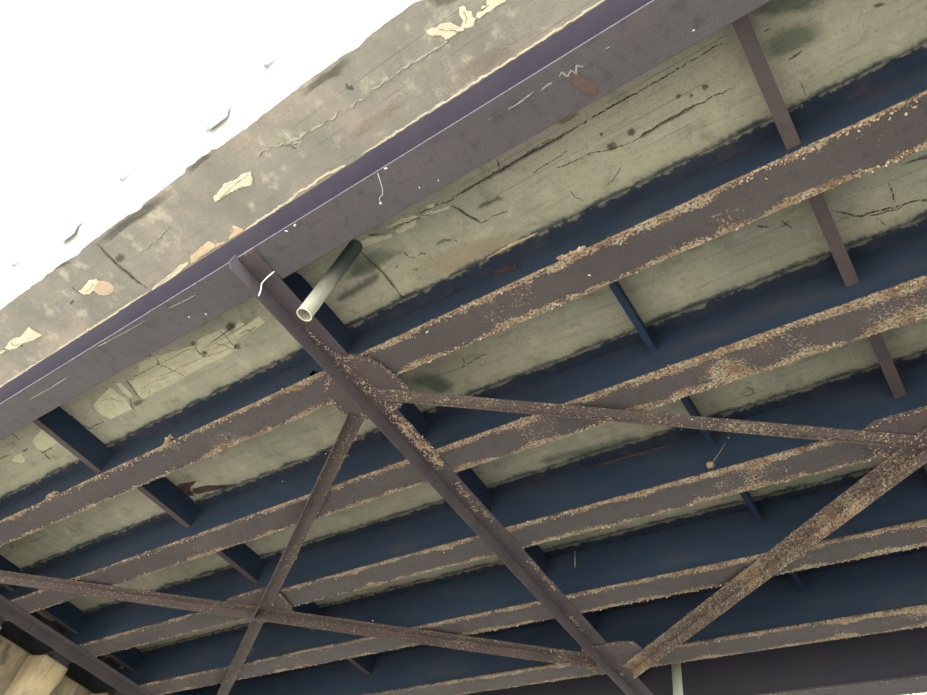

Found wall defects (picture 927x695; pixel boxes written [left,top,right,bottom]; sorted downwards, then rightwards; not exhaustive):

spalling [0,165,346,388]
spalling [361,0,604,156]
crack [447,43,727,223]
crack [837,183,927,227]
peeling [71,317,264,429]
rust [177,481,235,496]